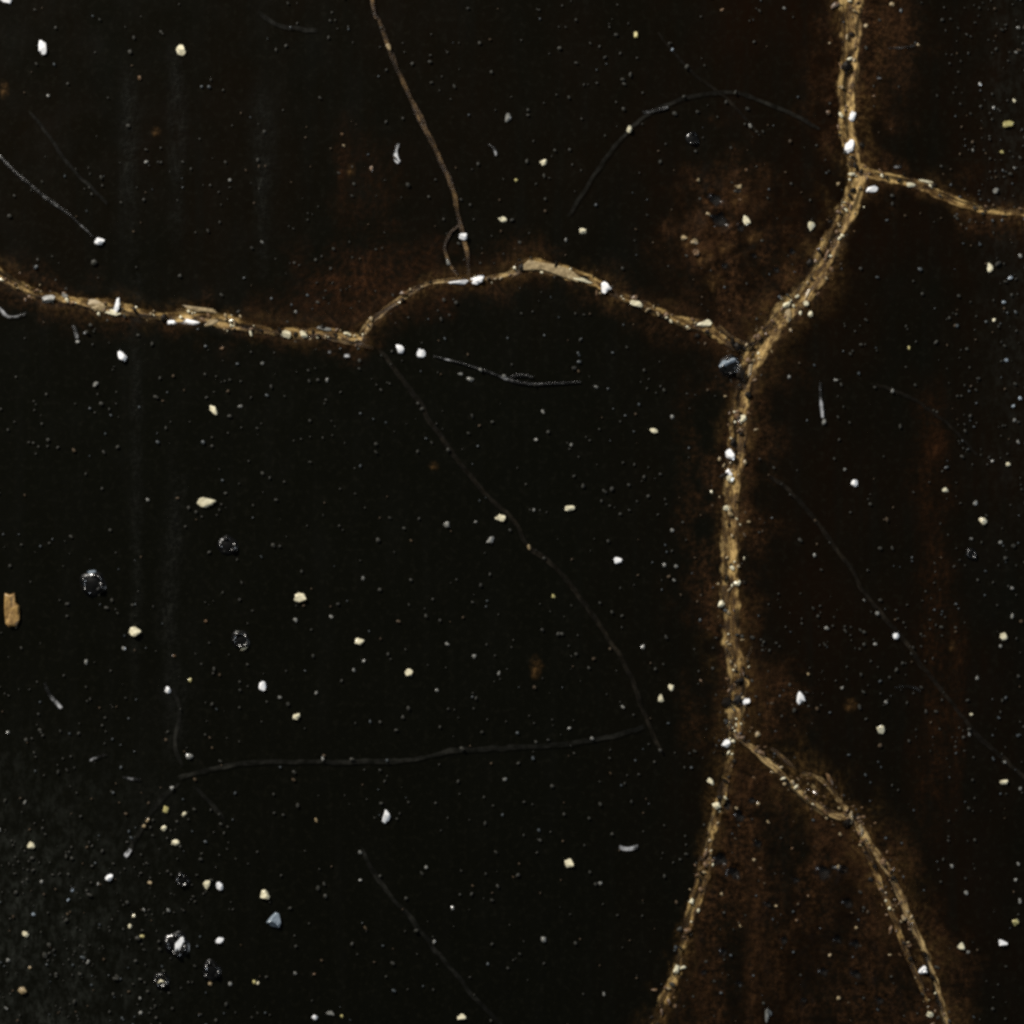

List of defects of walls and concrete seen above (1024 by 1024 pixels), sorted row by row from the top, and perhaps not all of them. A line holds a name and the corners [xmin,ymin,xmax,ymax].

crack [0,0,603,349]
crack [606,0,1024,1024]